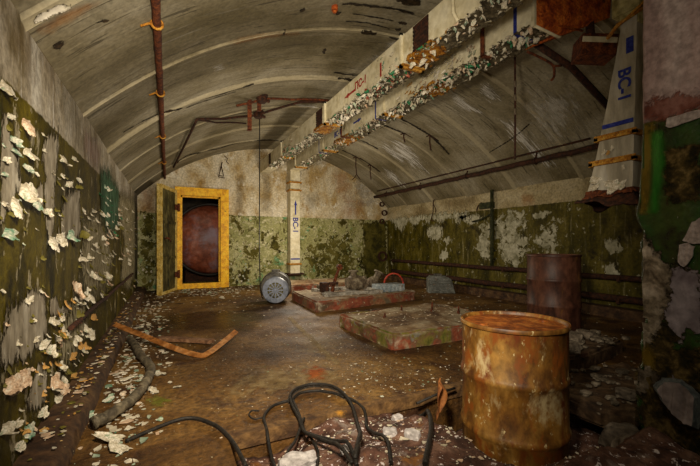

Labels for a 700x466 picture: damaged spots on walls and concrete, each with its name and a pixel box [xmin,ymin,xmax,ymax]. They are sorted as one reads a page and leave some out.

peeling [0,79,19,101]
peeling [268,0,545,169]
peeling [589,176,627,194]
peeling [0,112,157,455]
peeling [302,206,562,279]
peeling [603,237,624,275]
spalling [636,233,700,396]